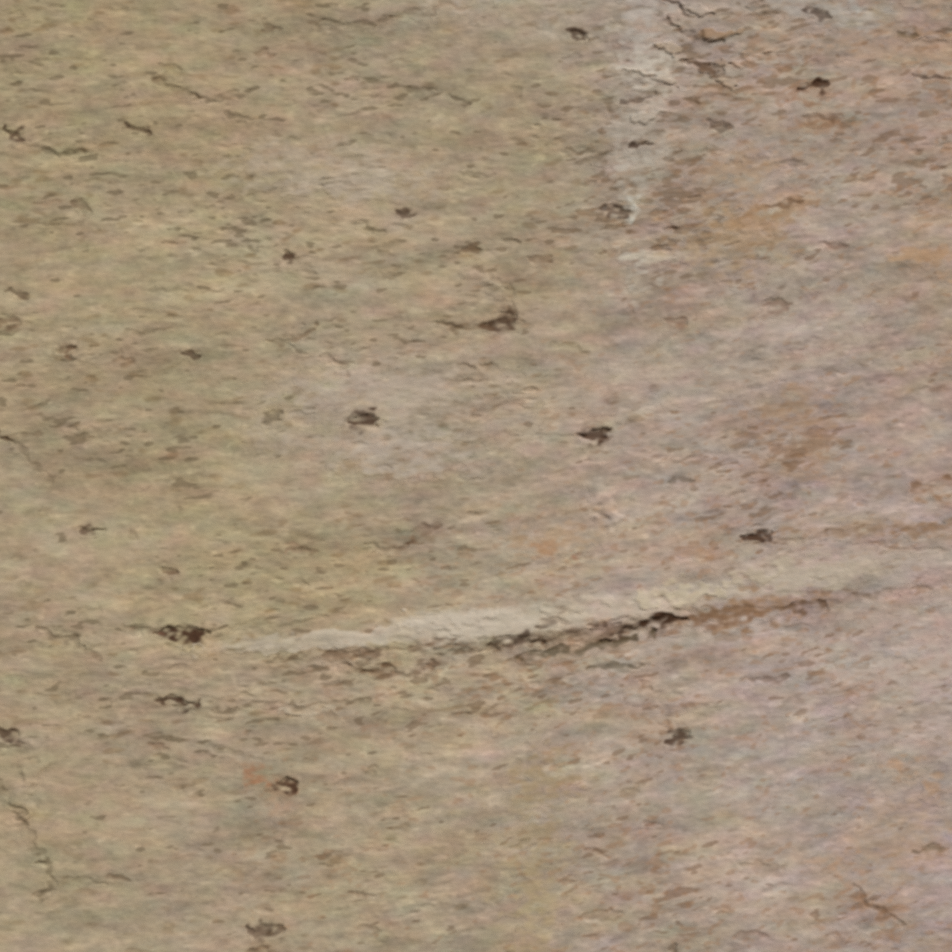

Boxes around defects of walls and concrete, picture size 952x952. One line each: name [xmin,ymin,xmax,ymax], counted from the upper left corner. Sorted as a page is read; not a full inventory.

crack [769,473,952,555]
crack [363,519,443,557]
crack [34,623,103,665]
crack [119,610,348,650]
crack [246,583,936,714]